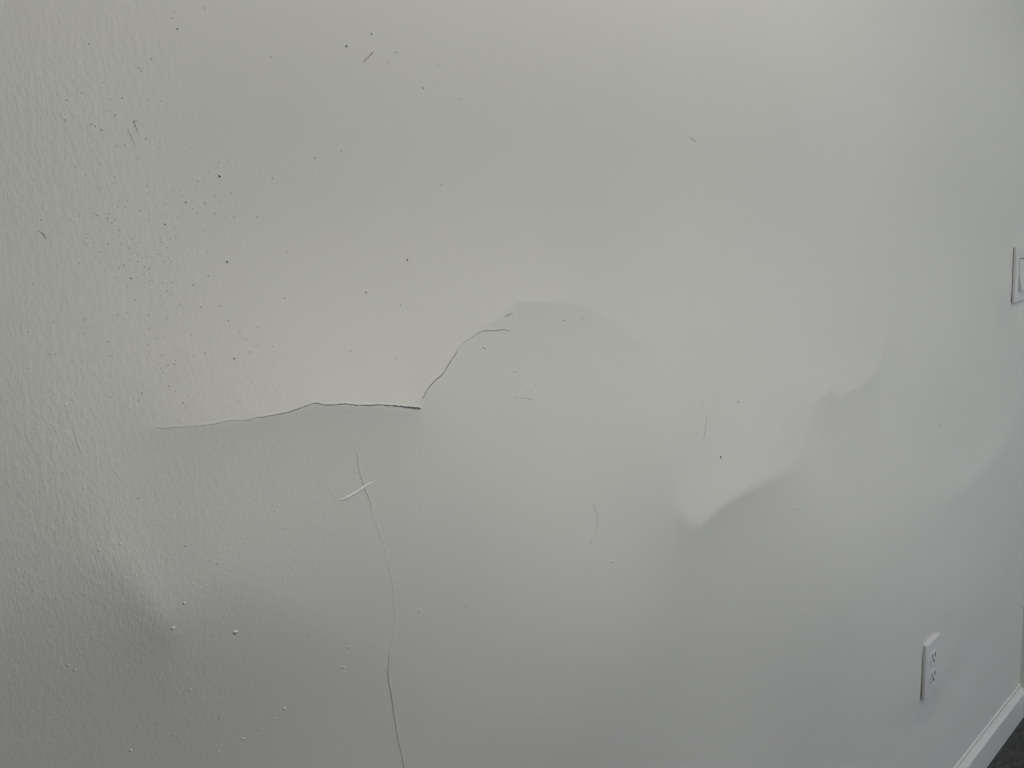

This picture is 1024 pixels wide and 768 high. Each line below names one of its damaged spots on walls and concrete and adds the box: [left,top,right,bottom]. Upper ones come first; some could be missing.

crack [356,452,406,768]